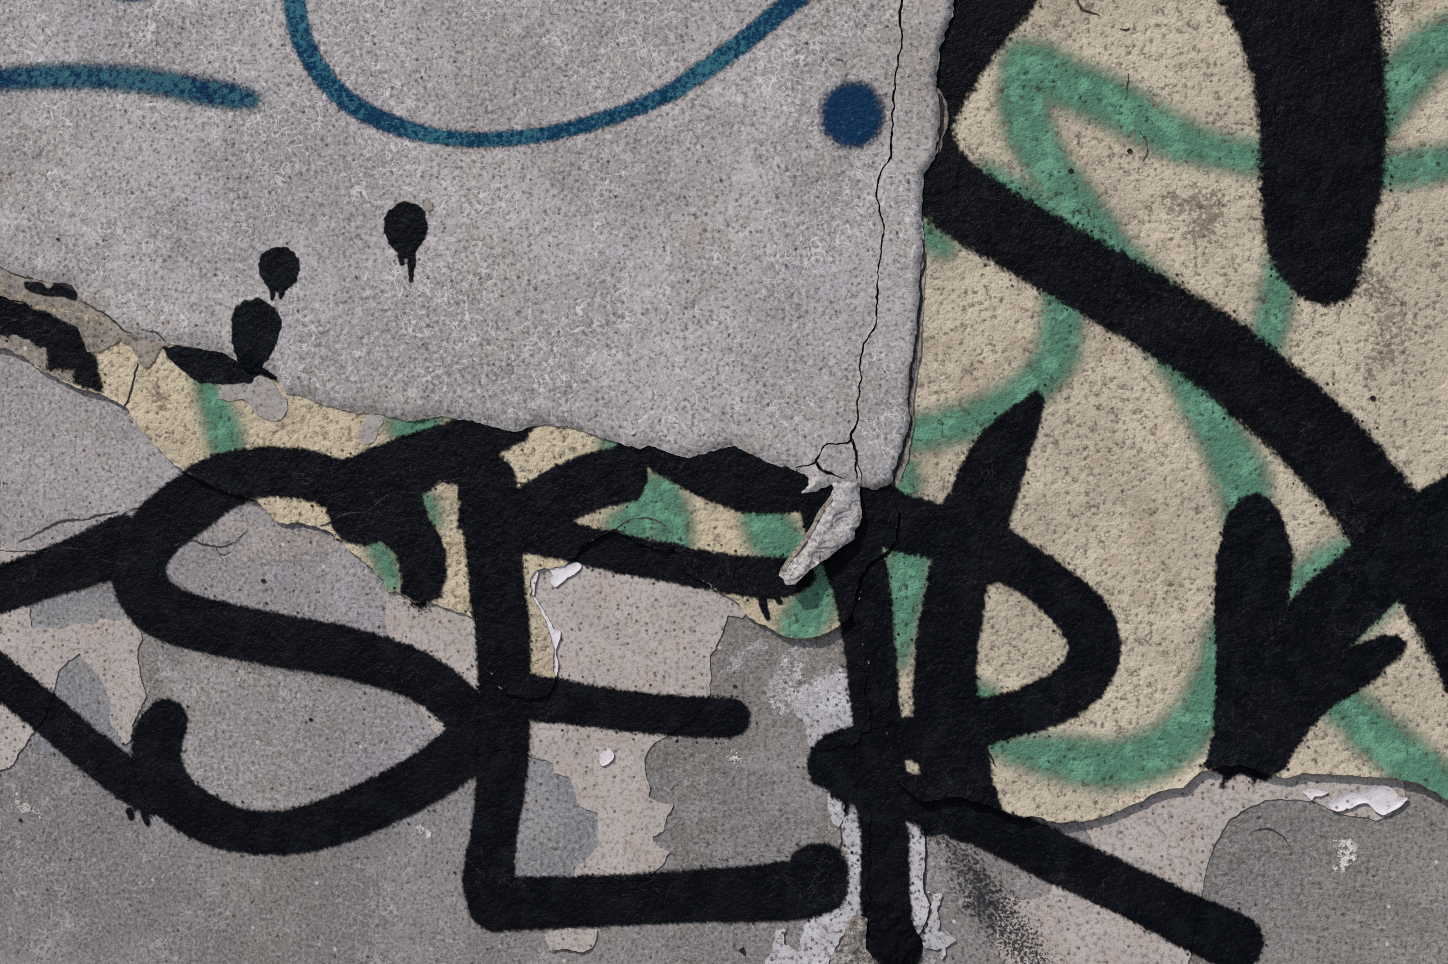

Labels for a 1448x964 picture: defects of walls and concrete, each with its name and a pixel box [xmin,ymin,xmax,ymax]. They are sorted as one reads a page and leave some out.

peeling [0,335,183,564]
peeling [218,375,288,421]
peeling [165,499,479,693]
peeling [779,481,862,585]
crack [797,0,926,615]
peeling [513,561,956,964]